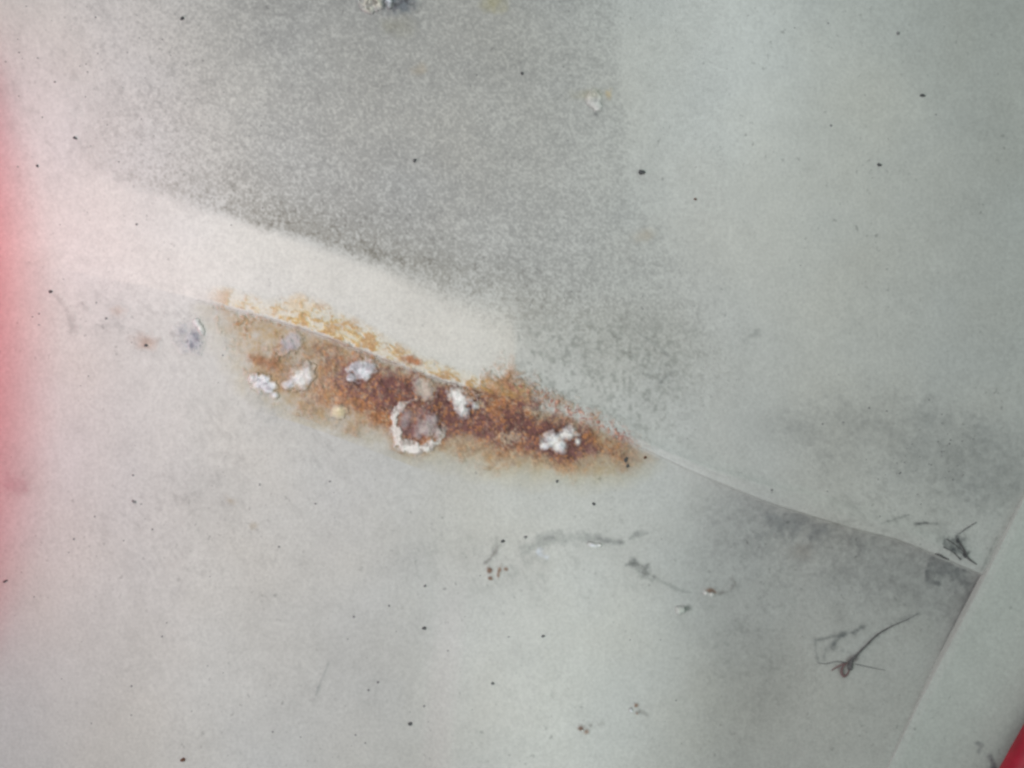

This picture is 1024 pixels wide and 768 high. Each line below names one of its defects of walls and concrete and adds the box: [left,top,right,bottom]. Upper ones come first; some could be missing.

corrosion [188,285,669,499]